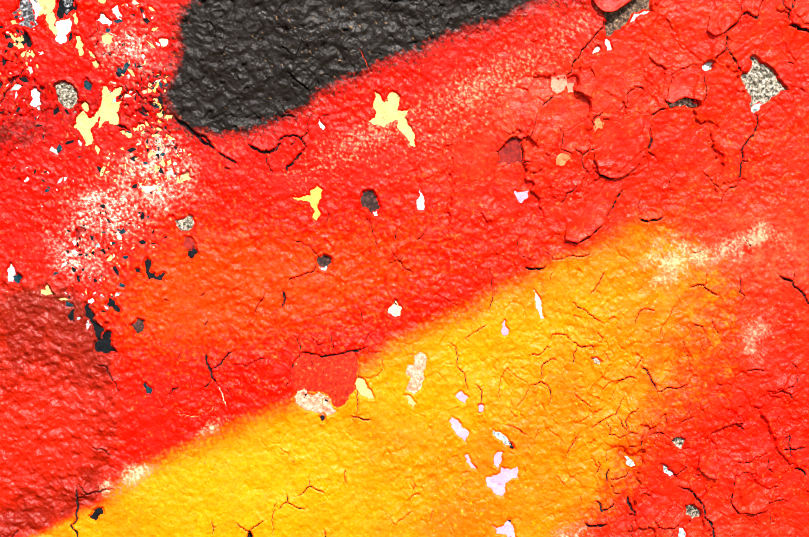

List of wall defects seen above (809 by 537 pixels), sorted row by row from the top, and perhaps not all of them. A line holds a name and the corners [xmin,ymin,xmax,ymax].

crack [782,0,809,33]
spalling [0,0,236,199]
crack [248,113,328,174]
peeling [369,92,415,147]
crack [648,0,763,149]
spalling [741,57,786,113]
crack [516,129,623,280]
peeling [52,204,168,353]
peeling [404,352,427,407]
crack [566,320,719,456]
peeling [486,431,518,496]
crack [556,454,636,536]